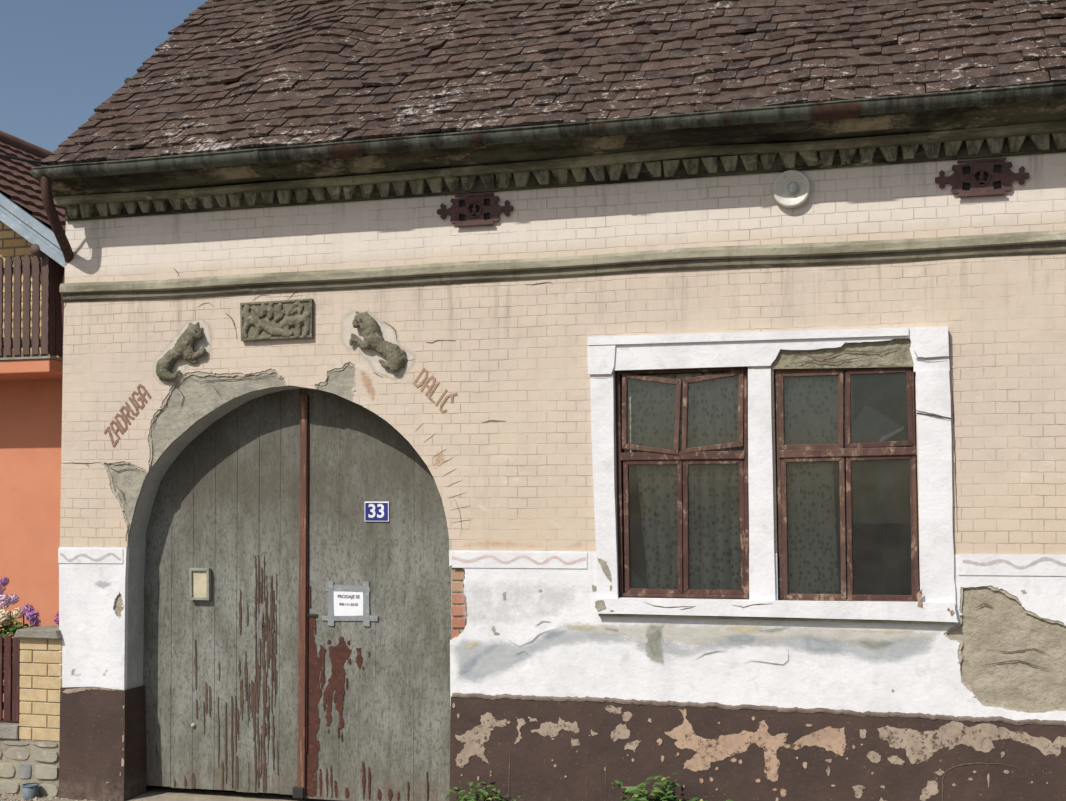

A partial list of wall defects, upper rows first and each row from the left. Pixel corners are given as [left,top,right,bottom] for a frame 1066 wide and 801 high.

flaking render [451,566,468,640]
water stain [457,624,934,681]
peeling [455,712,598,781]
peeling [605,705,641,762]
peeling [657,709,1066,801]